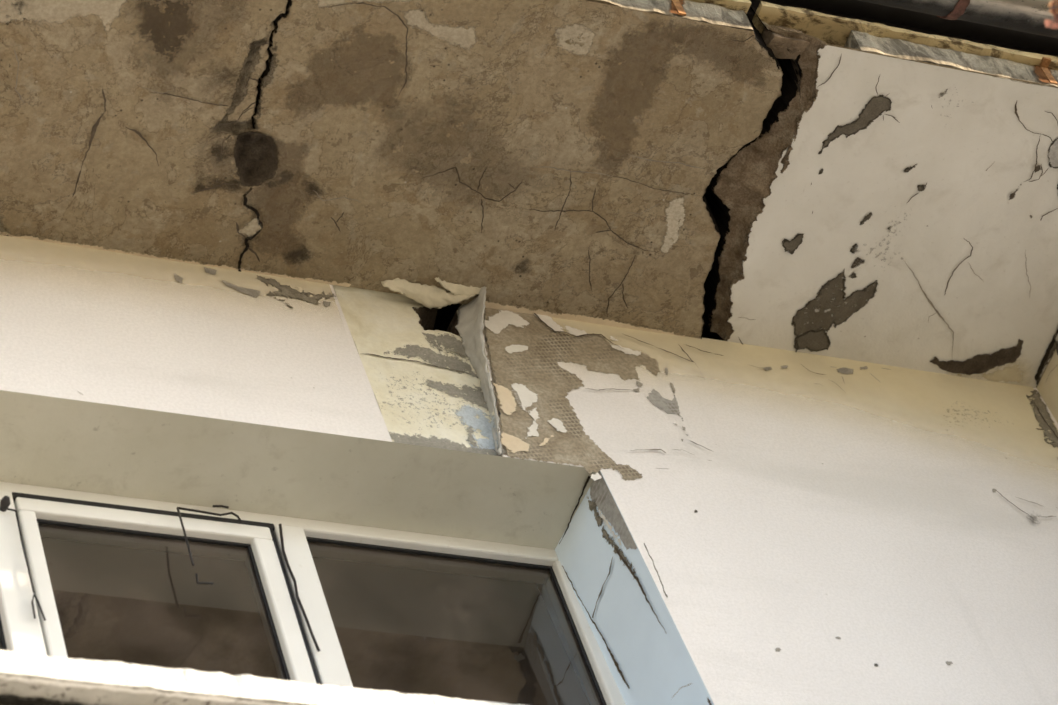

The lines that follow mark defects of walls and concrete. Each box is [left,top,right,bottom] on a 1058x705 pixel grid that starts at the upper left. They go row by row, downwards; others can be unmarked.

crack [126,127,159,166]
crack [142,0,292,156]
crack [197,183,263,272]
crack [423,6,842,380]
peeling [818,76,900,154]
peeling [1048,138,1058,169]
peeling [792,244,878,352]
peeling [381,277,688,583]
peeling [930,339,1024,376]
peeling [1027,340,1058,448]